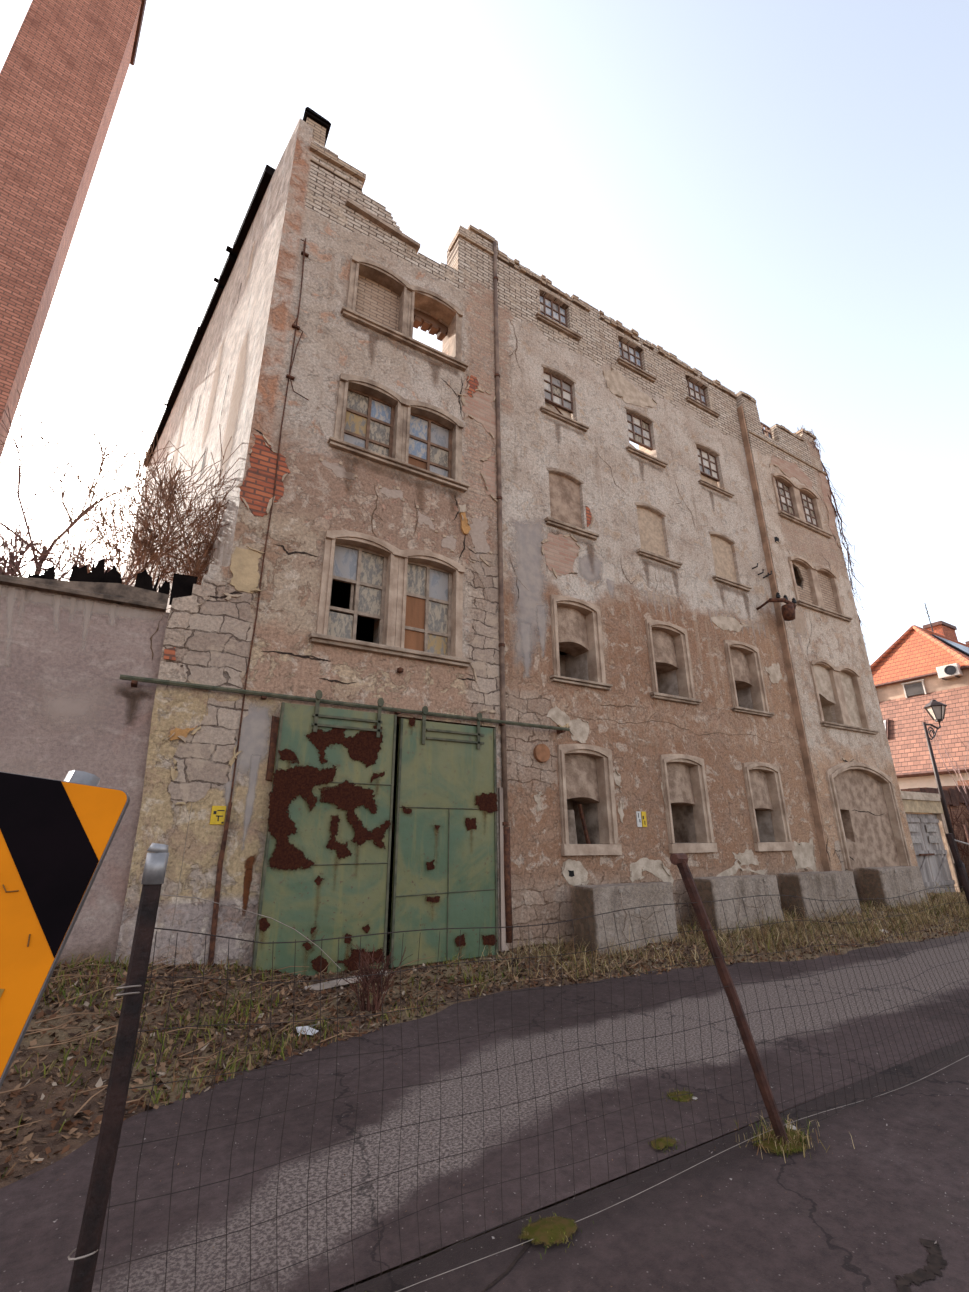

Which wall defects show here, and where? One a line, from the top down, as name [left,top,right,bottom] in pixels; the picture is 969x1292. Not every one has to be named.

spalling [236,434,291,517]
spalling [541,533,581,578]
spalling [162,588,258,805]
rust [242,724,391,932]
rust [465,792,498,831]